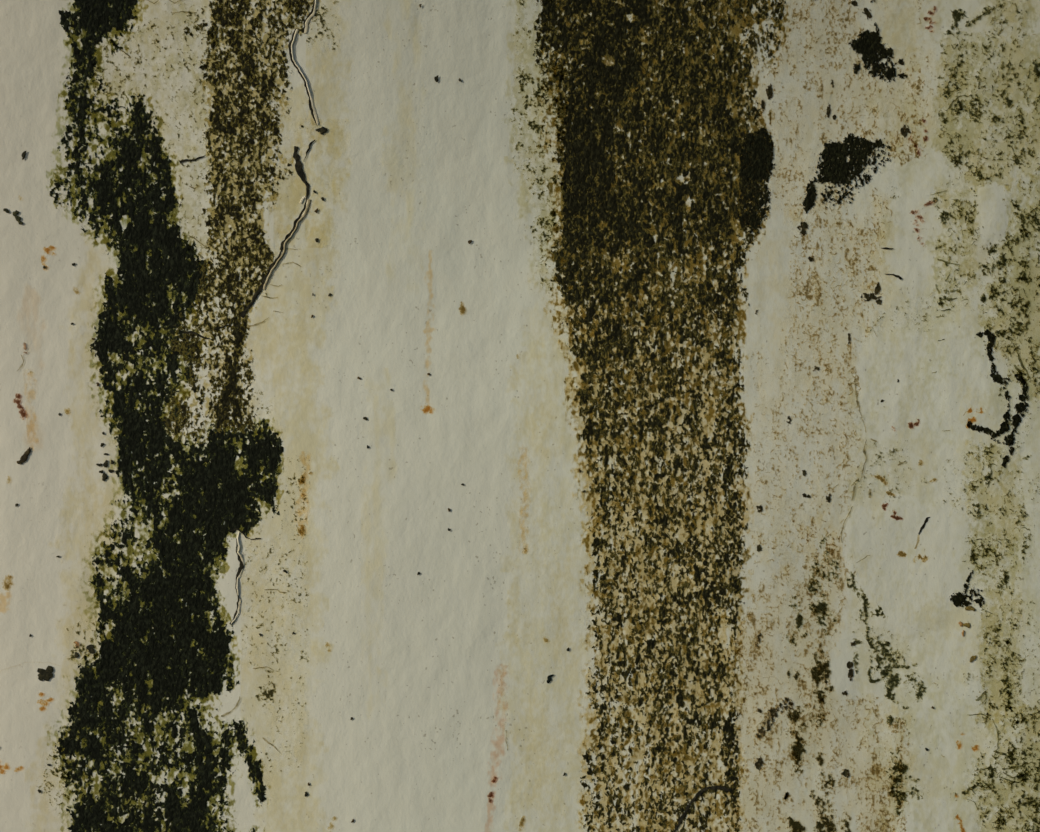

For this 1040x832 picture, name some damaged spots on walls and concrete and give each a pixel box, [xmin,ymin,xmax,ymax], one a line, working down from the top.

water stain [39,0,335,832]
crack [182,0,319,339]
water stain [512,0,923,832]
water stain [923,0,1040,832]